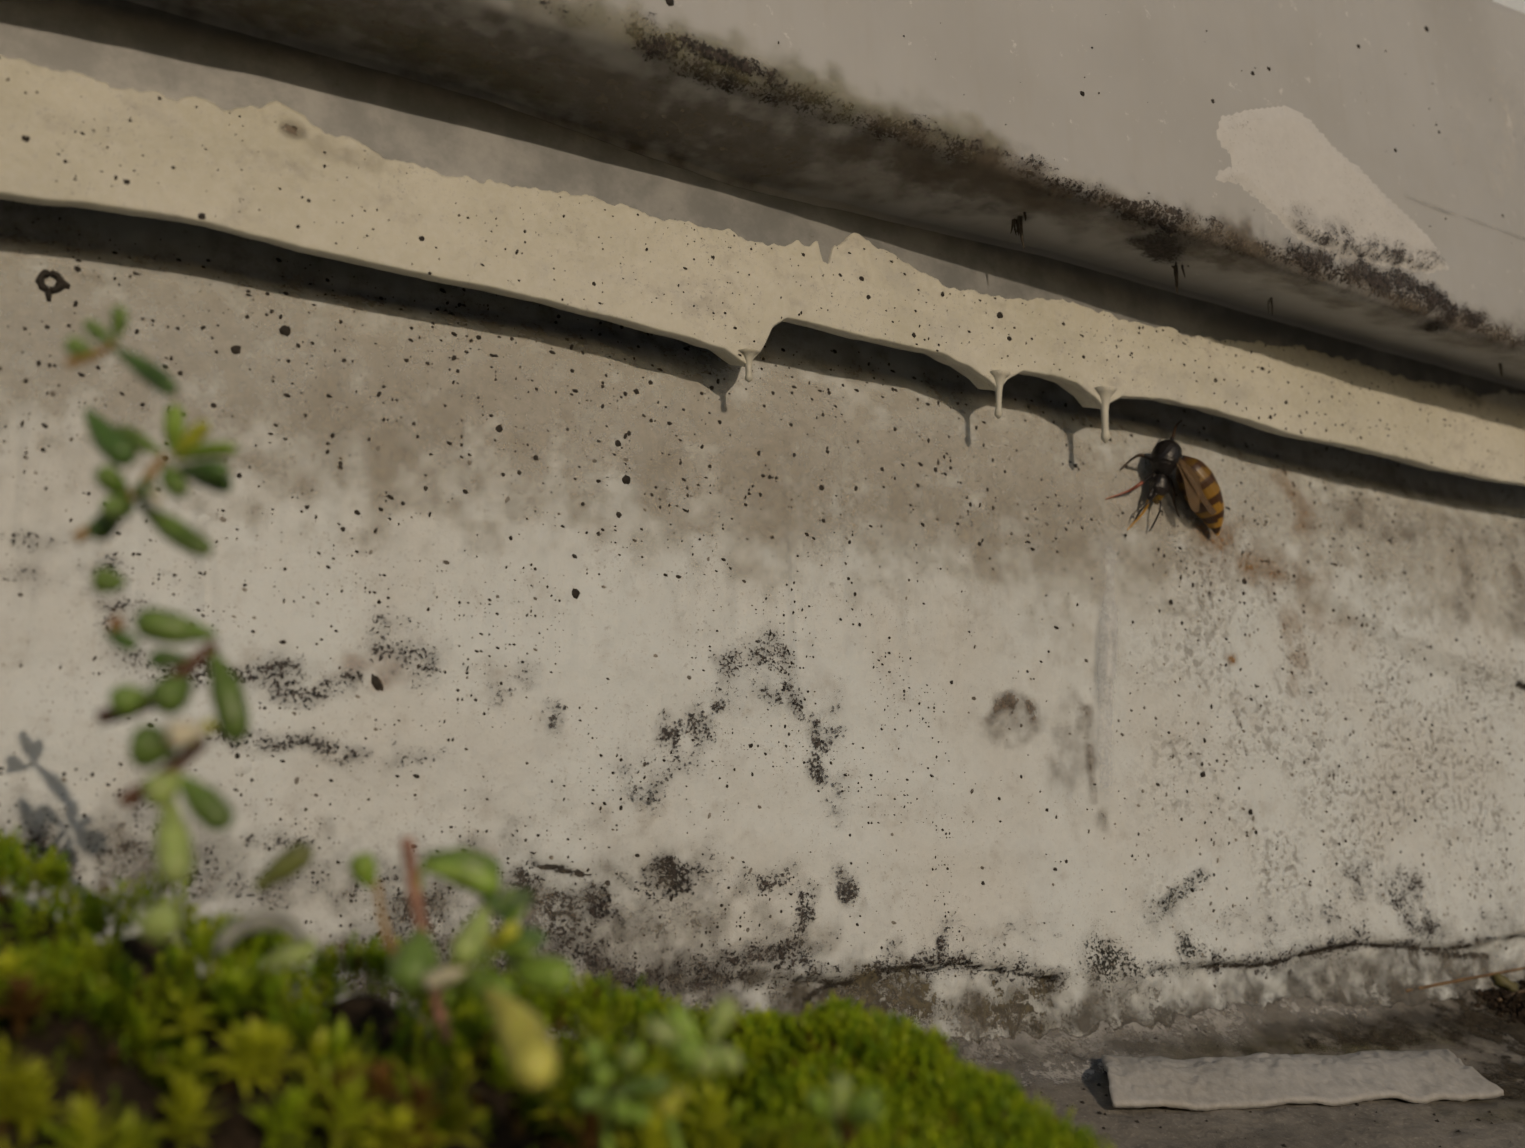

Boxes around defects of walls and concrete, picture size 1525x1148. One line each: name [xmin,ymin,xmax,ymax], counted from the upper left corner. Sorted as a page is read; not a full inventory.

damp [215,0,1525,352]
crack [1157,933,1525,970]
crack [661,962,1058,1002]